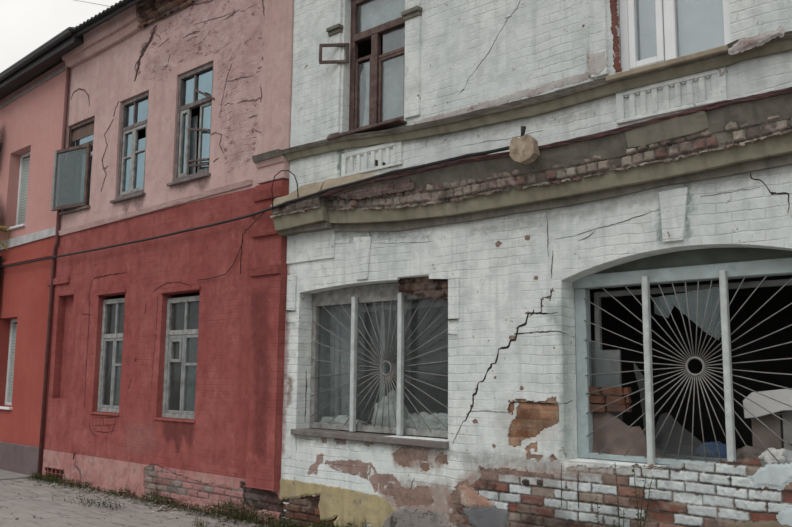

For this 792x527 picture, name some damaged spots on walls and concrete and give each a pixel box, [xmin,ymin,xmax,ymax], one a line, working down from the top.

crack [134,0,239,81]
crack [220,63,262,132]
crack [459,1,520,94]
peeling [413,0,622,124]
crack [101,101,119,191]
spalling [270,115,792,218]
crack [701,172,790,211]
crack [452,210,657,444]
spalling [507,385,559,462]
spalling [144,463,338,527]
peeling [307,453,434,506]
spalling [449,458,792,527]